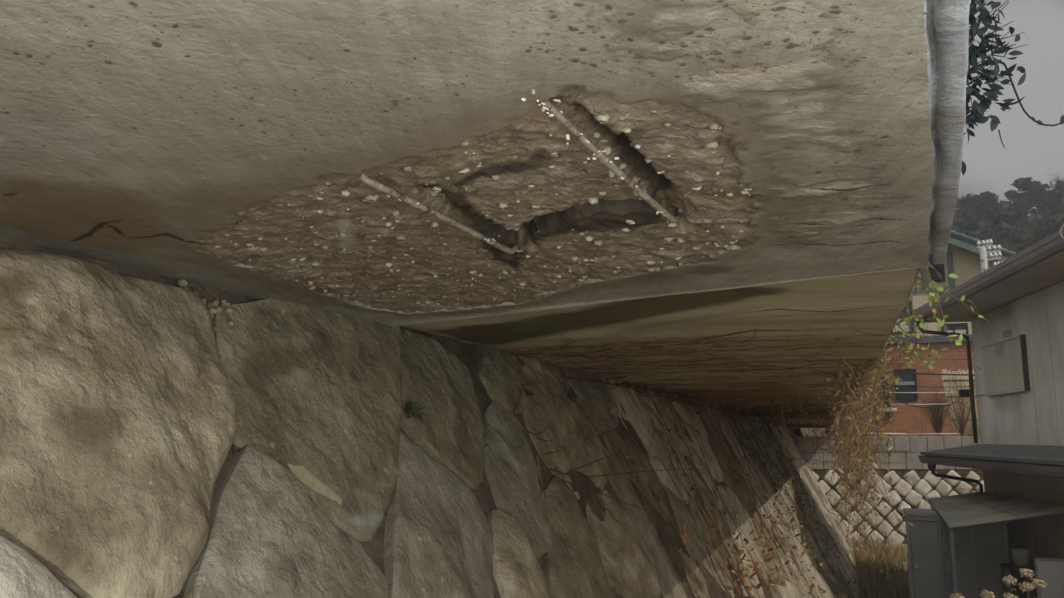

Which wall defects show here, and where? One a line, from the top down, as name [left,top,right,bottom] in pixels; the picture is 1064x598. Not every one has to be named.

crack [71,219,220,246]
spalling [196,85,769,313]